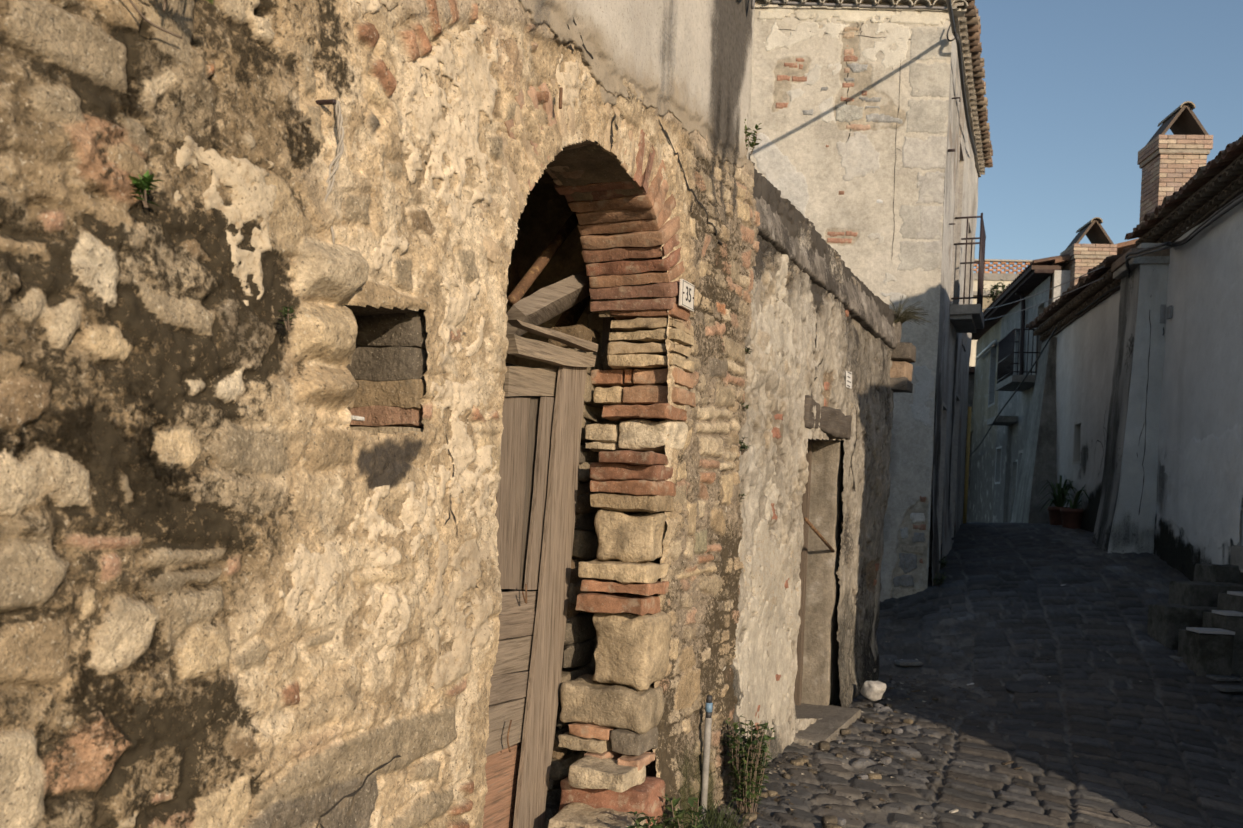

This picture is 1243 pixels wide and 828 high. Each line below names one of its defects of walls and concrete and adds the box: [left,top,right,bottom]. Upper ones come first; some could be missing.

peeling [355,0,399,16]
peeling [399,23,509,226]
flaking render [538,170,554,184]
flaking render [519,0,911,174]
leakage [1081,278,1212,581]
spalling [865,496,929,598]